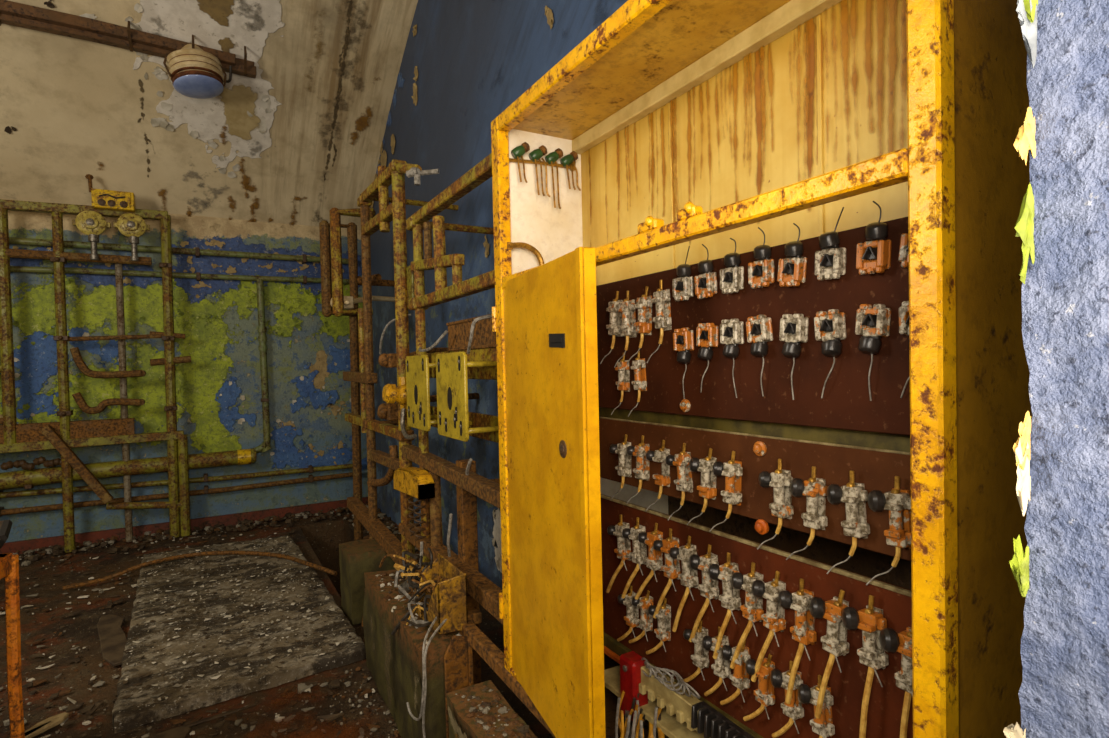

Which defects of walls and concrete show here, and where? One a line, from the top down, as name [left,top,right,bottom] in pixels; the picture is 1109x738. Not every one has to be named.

peeling [545,6,554,29]
peeling [125,0,285,178]
peeling [374,66,418,180]
rust [228,158,259,222]
peeling [9,235,367,475]
peeling [492,508,502,573]